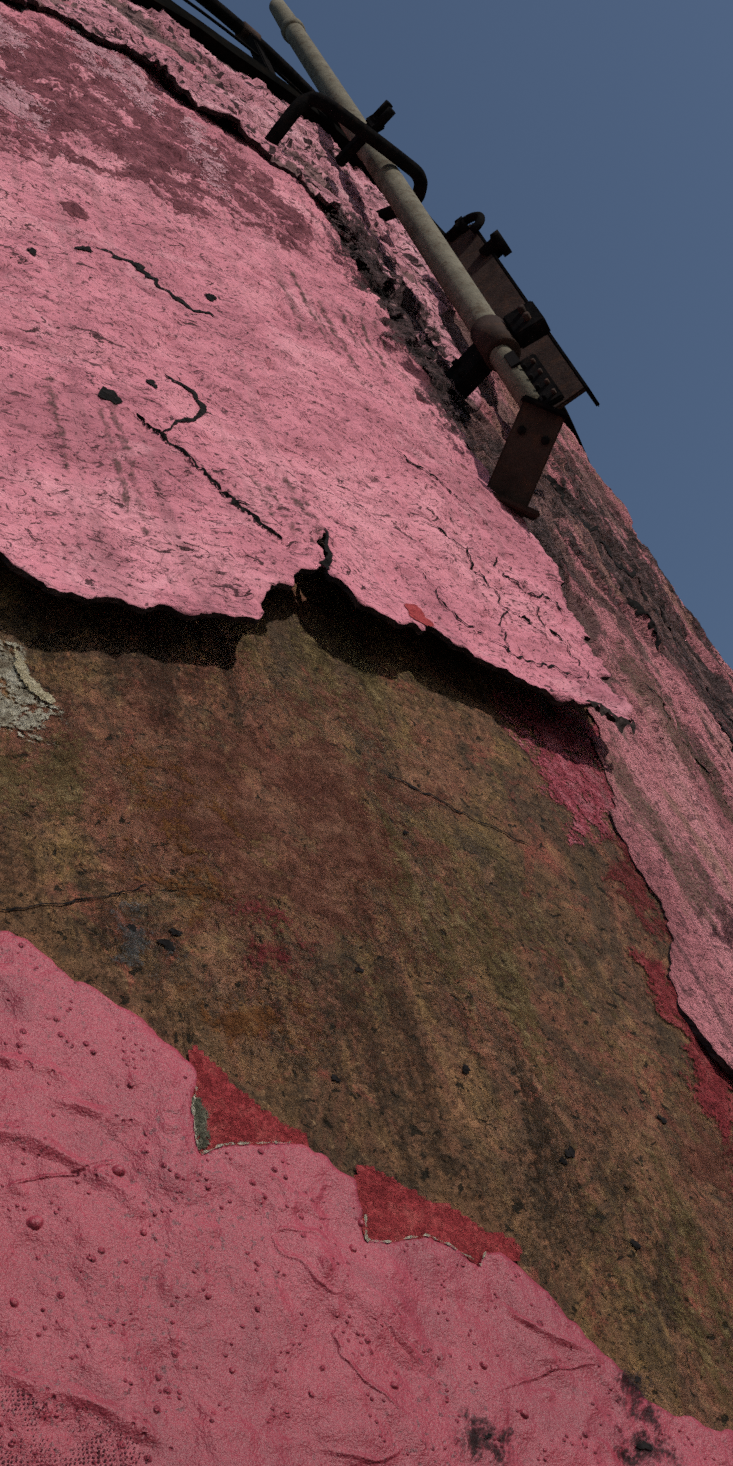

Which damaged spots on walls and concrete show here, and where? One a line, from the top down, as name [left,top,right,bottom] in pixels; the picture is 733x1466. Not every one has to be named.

peeling [0,7,335,261]
crack [94,246,217,318]
crack [136,373,284,544]
crack [319,528,333,569]
spalling [0,543,733,1431]